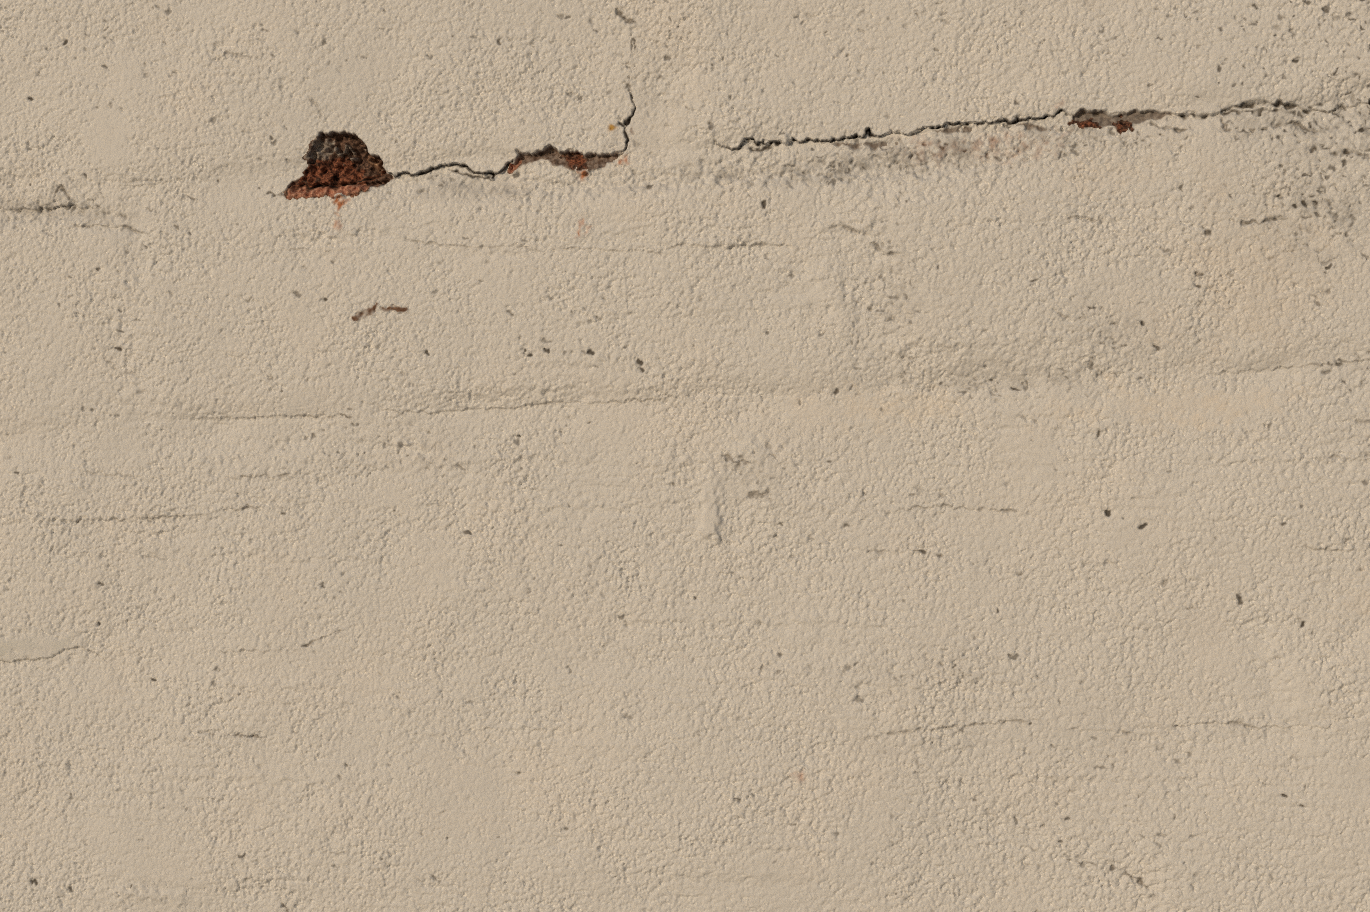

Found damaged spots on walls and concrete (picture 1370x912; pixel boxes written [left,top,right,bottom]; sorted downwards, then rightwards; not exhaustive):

crack [716,108,1072,153]
spalling [264,129,396,200]
crack [386,158,514,181]